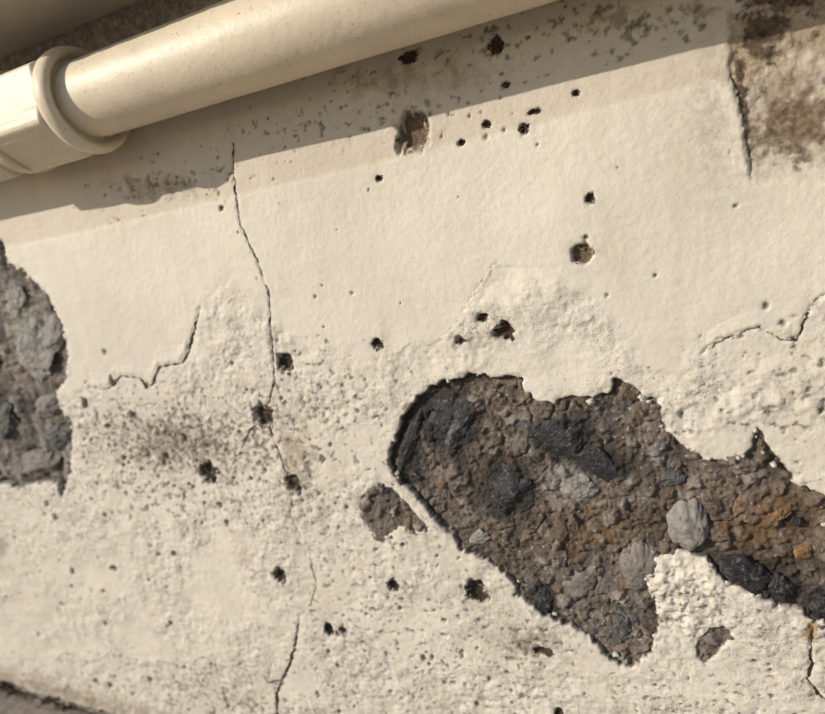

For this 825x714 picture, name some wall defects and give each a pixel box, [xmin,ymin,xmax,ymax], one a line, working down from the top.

spalling [0,240,73,485]
crack [112,308,200,389]
crack [232,143,295,522]
crack [707,298,819,348]
spalling [359,373,825,665]
crack [806,625,825,699]